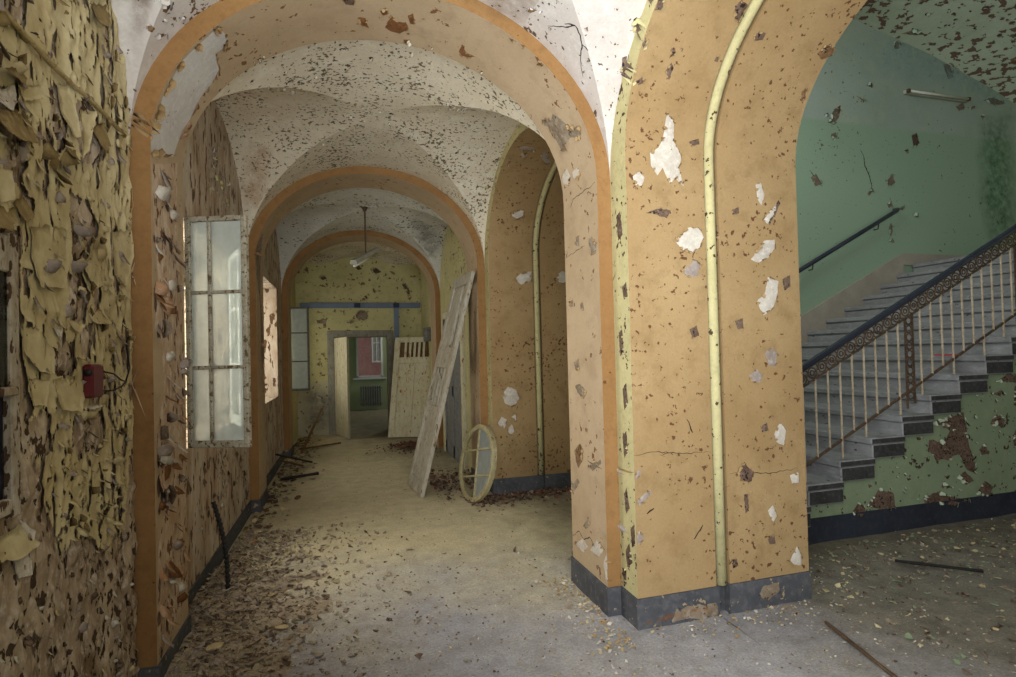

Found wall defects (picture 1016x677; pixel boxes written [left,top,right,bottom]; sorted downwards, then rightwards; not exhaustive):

peeling [380,8,416,58]
peeling [733,1,748,24]
peeling [620,56,644,86]
peeling [475,114,581,212]
peeling [633,112,699,186]
peeling [755,182,780,225]
peeling [675,227,704,278]
peeling [751,240,776,262]
peeling [756,275,791,315]
peeling [760,422,787,446]
peeling [852,394,993,517]
peeling [737,462,755,513]